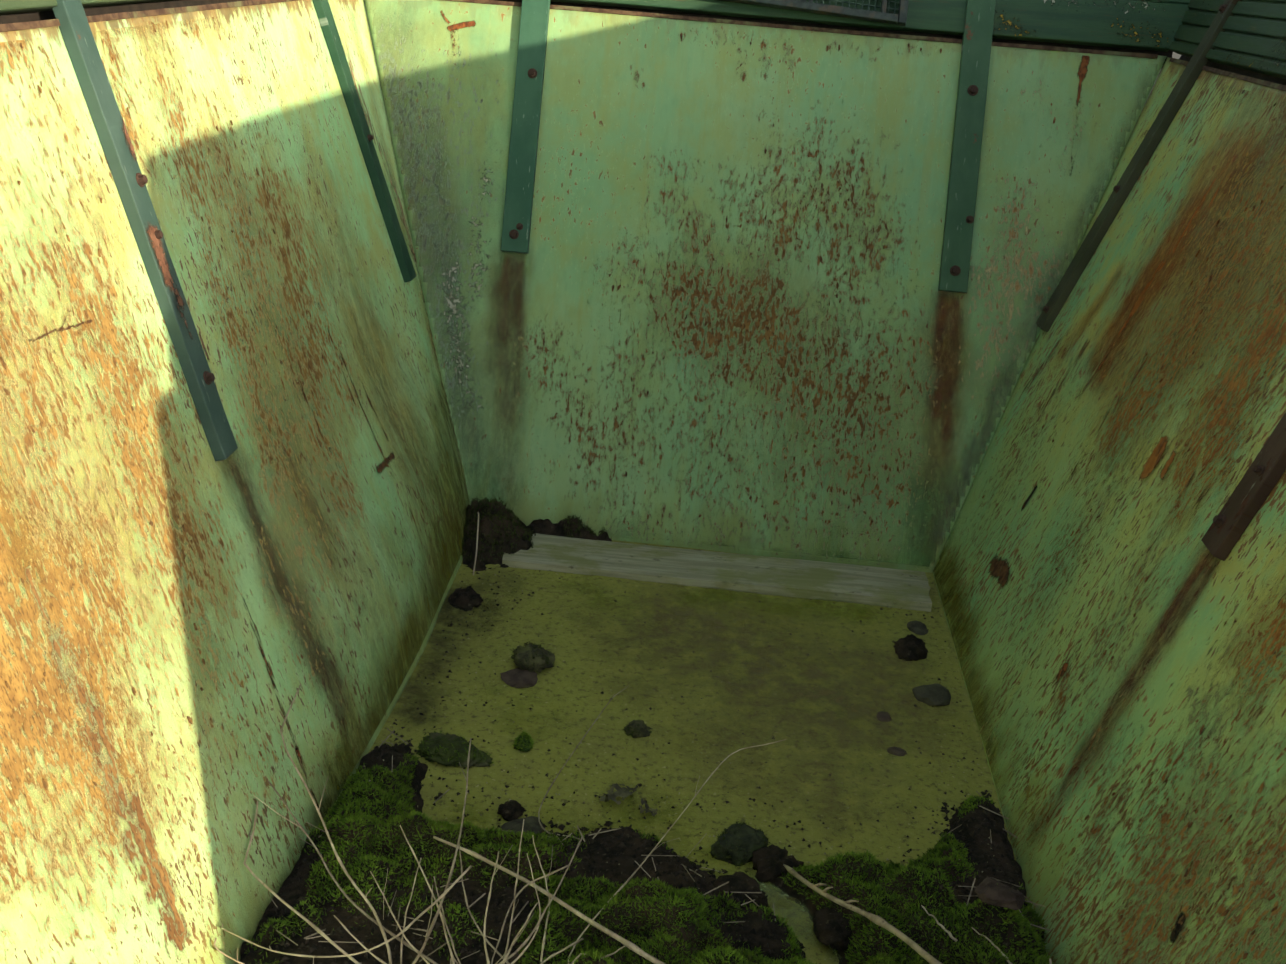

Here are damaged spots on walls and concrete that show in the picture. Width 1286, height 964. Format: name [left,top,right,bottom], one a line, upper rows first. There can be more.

corrosion [1076,55,1090,120]
corrosion [147,225,210,360]
corrosion [328,331,389,457]
water stain [496,253,524,422]
corrosion [1140,436,1176,481]
corrosion [25,566,191,962]
corrosion [243,599,322,821]